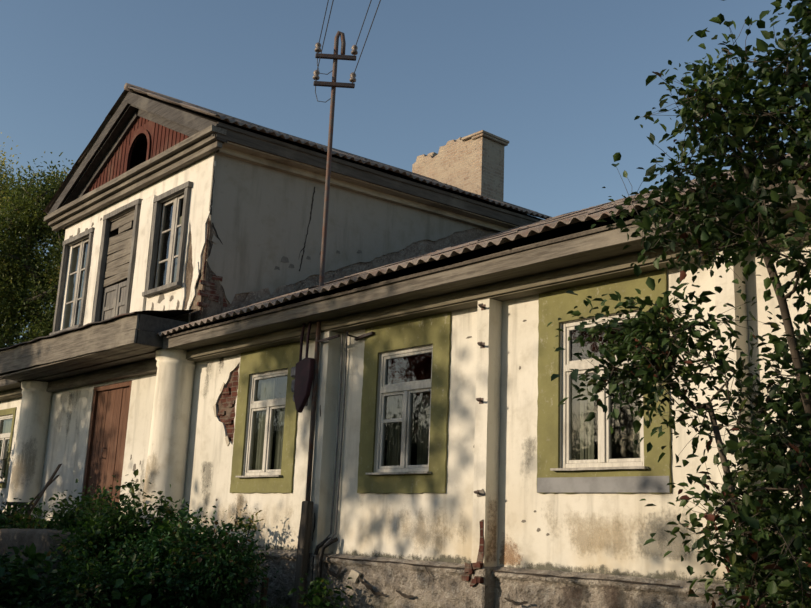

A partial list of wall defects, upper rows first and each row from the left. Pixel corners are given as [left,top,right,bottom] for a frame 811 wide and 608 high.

crack [299,187,315,271]
spalling [190,218,228,323]
flaking render [239,231,498,307]
flaking render [213,366,239,446]
water stain [346,551,402,559]
water stain [412,555,471,564]
water stain [507,563,725,584]
water stain [638,517,691,559]
water stain [602,586,620,608]